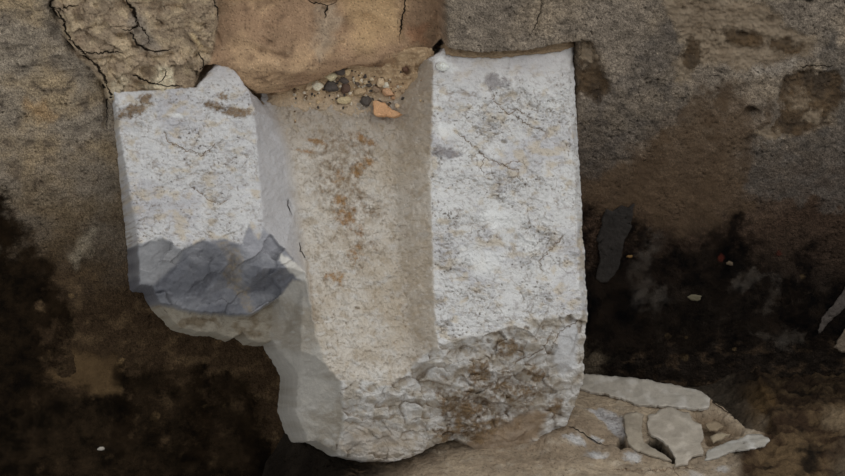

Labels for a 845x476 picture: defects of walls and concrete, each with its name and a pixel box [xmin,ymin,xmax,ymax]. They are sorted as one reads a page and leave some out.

crack [49,0,204,123]
leakage [0,196,271,476]
spalling [127,226,307,317]
leakage [583,212,845,379]